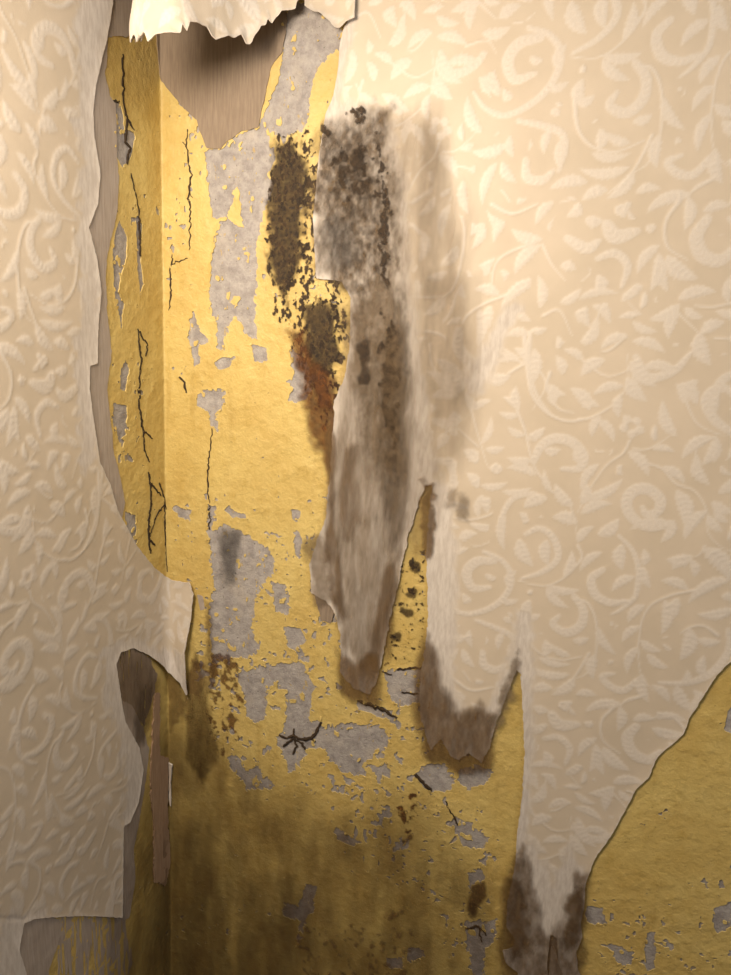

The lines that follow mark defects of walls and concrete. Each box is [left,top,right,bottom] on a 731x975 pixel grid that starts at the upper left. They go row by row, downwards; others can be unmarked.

crack [113,54,142,256]
peeling [112,216,143,328]
crack [168,129,193,311]
peeling [129,0,355,370]
crack [137,329,168,572]
peeling [197,388,226,432]
leakage [264,106,518,773]
leakage [168,653,243,783]
crack [279,722,322,755]
peeling [206,504,417,783]
peeling [415,763,494,794]
leakage [499,857,585,975]